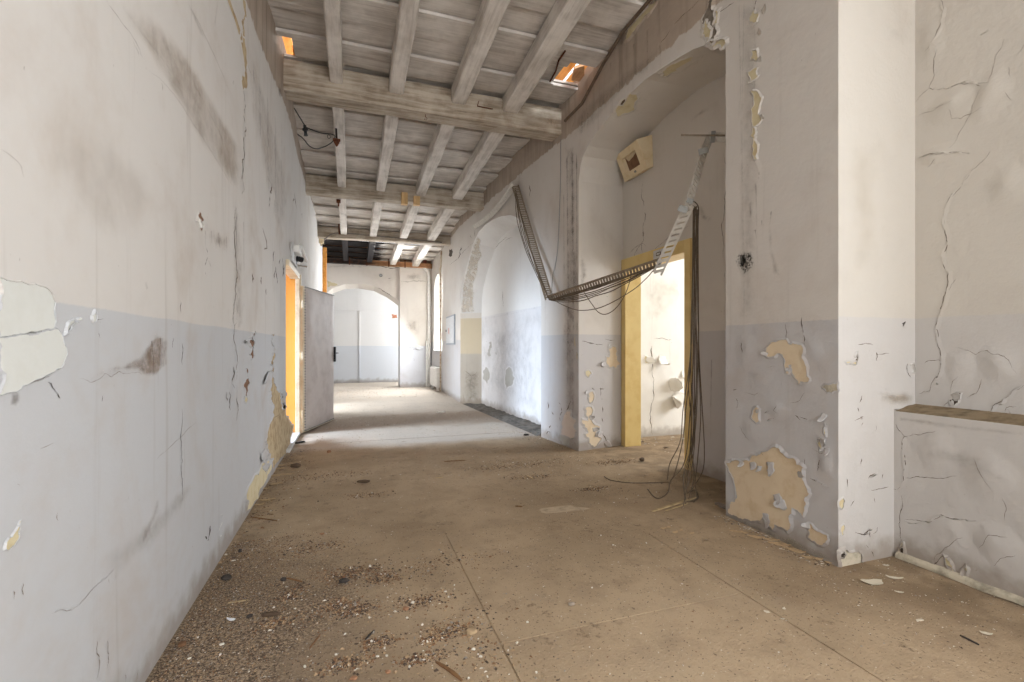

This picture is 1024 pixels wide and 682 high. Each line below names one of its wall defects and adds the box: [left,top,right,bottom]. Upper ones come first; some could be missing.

flaking render [655,0,730,78]
peeling [747,3,767,162]
crack [162,5,297,410]
crack [858,0,1024,414]
peeling [0,277,98,396]
peeling [244,330,294,515]
peeling [558,343,621,449]
peeling [668,371,684,409]
peeling [724,443,864,567]
peeling [760,338,840,394]
crack [804,397,1014,566]